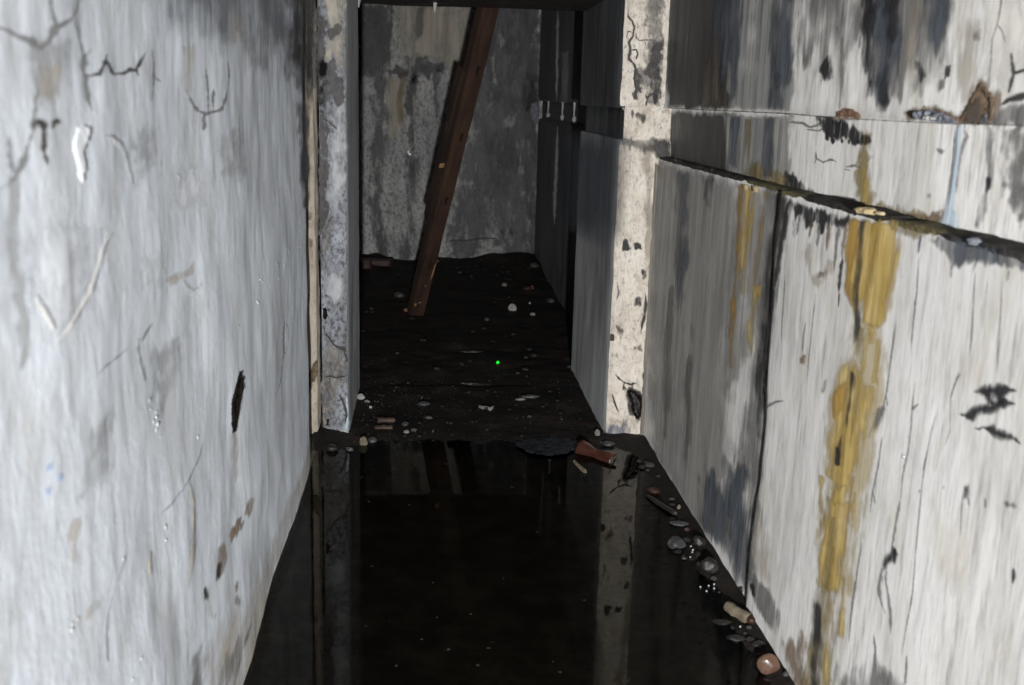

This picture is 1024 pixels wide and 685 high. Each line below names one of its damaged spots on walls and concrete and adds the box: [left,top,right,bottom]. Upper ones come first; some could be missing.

crack [0,88,59,189]
crack [0,0,159,110]
crack [187,62,230,131]
crack [626,0,1024,126]
spalling [957,80,1001,126]
rust [725,184,767,388]
damp [649,0,1024,626]
rust [807,137,943,685]